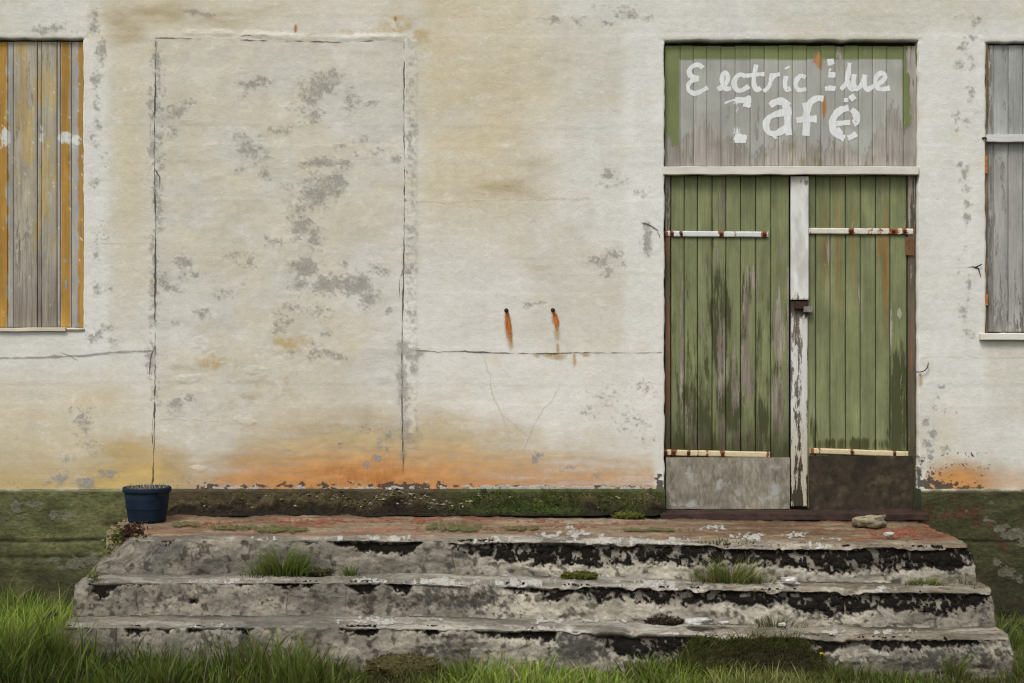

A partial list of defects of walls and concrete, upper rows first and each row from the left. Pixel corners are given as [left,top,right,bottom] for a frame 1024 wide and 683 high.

peeling [287,157,349,244]
peeling [291,258,378,307]
crack [399,62,618,464]
water stain [74,423,650,489]
flaking render [914,407,990,489]
spalling [325,516,478,556]
peeling [983,518,1024,547]
spalling [89,583,121,598]
peeling [185,577,318,589]
peeling [350,576,476,594]
spalling [457,519,988,669]
peeling [336,615,444,637]